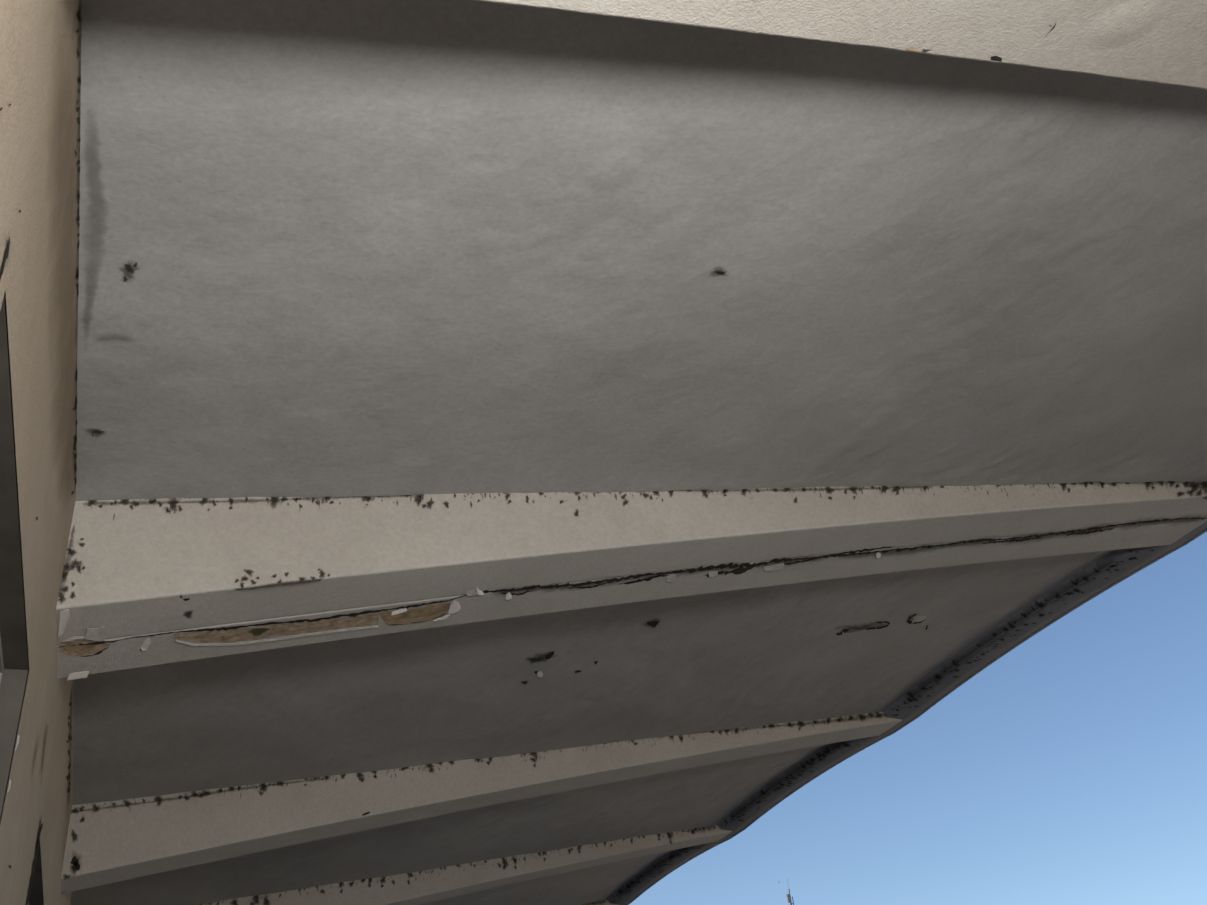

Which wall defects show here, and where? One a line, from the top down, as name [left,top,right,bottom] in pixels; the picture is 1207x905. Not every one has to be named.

crack [61,517,1206,647]
spalling [58,609,110,680]
spalling [174,601,460,646]